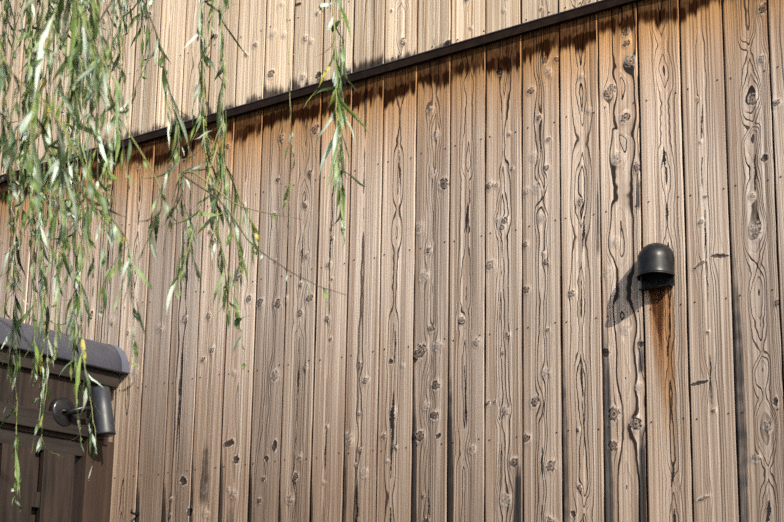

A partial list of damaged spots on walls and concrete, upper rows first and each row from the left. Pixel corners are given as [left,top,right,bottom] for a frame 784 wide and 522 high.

corrosion [650,288,665,339]